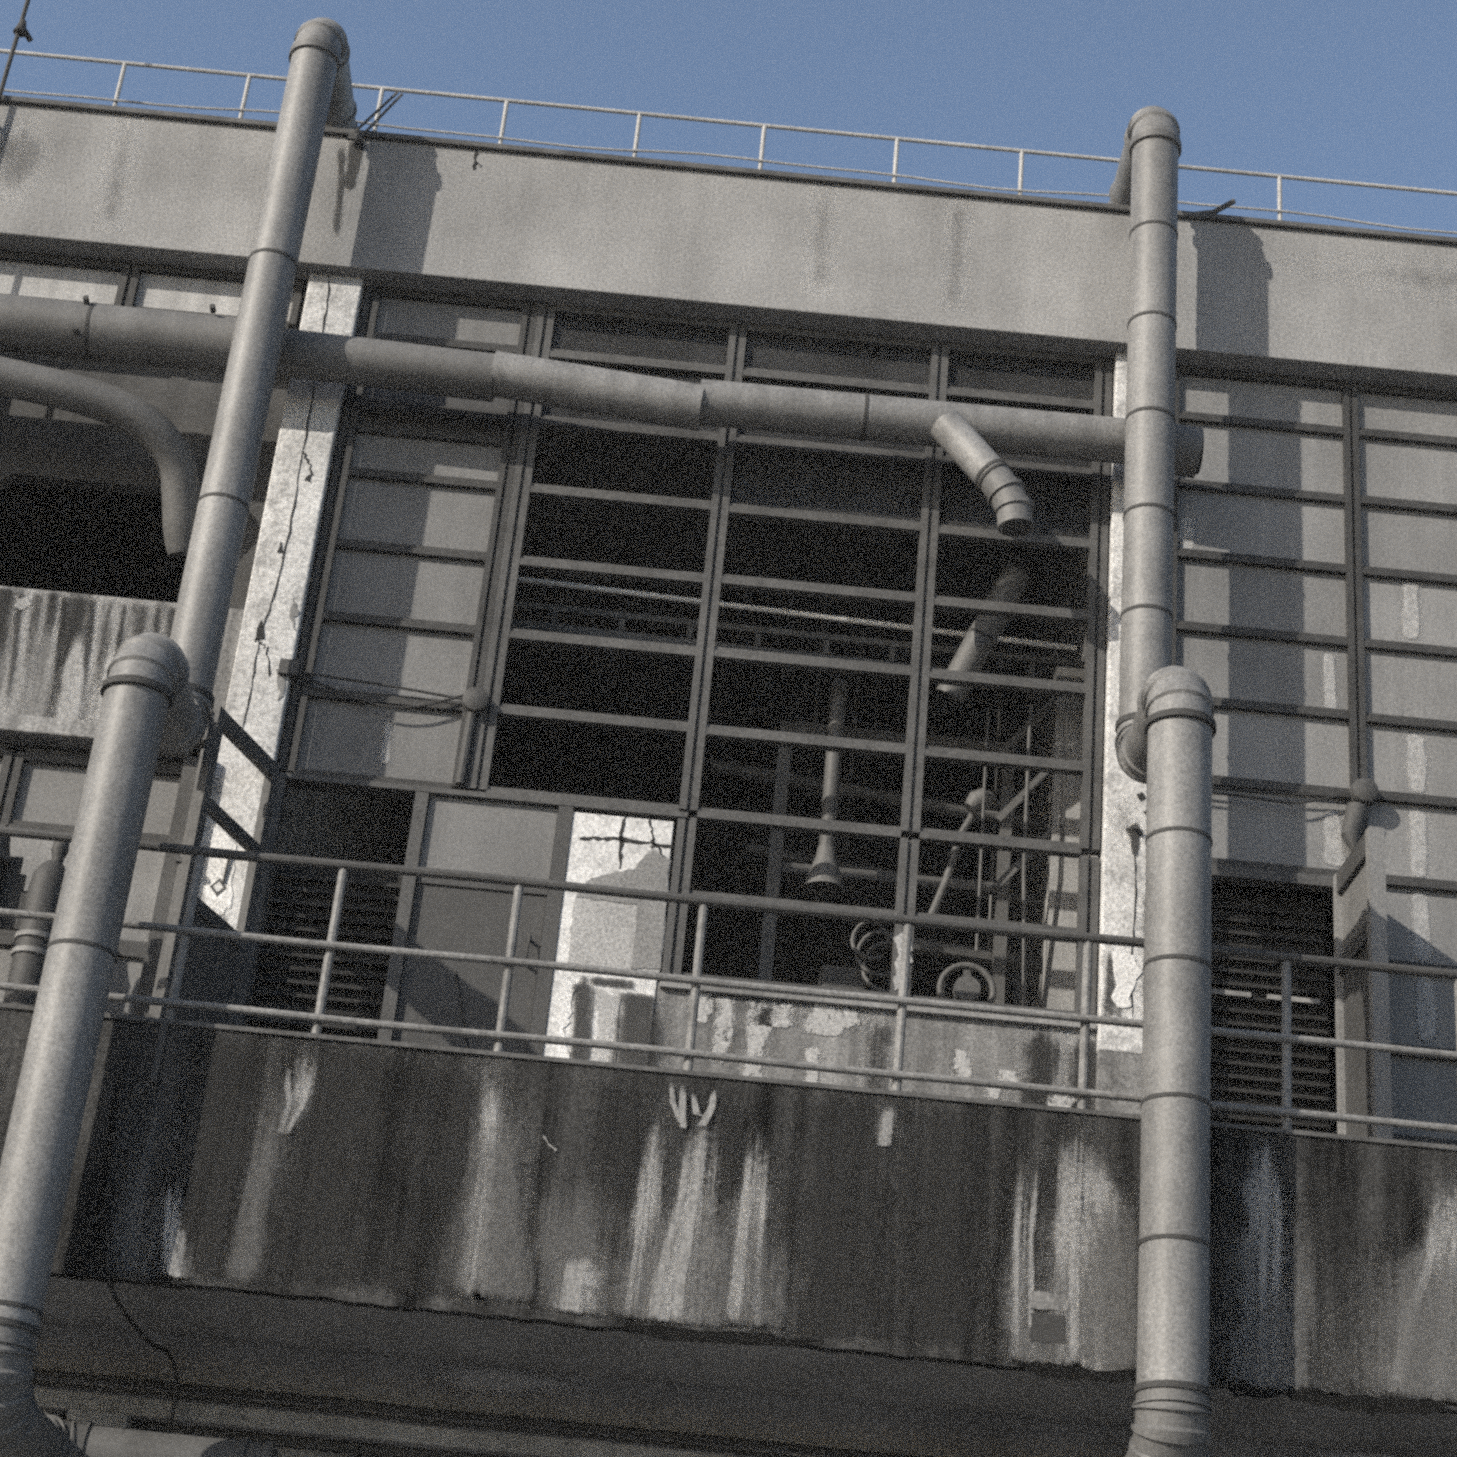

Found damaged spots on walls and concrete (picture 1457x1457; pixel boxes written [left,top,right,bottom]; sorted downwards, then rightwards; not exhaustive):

water stain [0,588,175,722]
water stain [571,976,660,1067]
water stain [1021,1034,1096,1109]
peeling [1111,950,1142,1009]
water stain [161,1028,978,1344]
water stain [1006,1157,1137,1371]
efflorescence [1230,1148,1313,1388]
efflorescence [1377,1198,1457,1400]